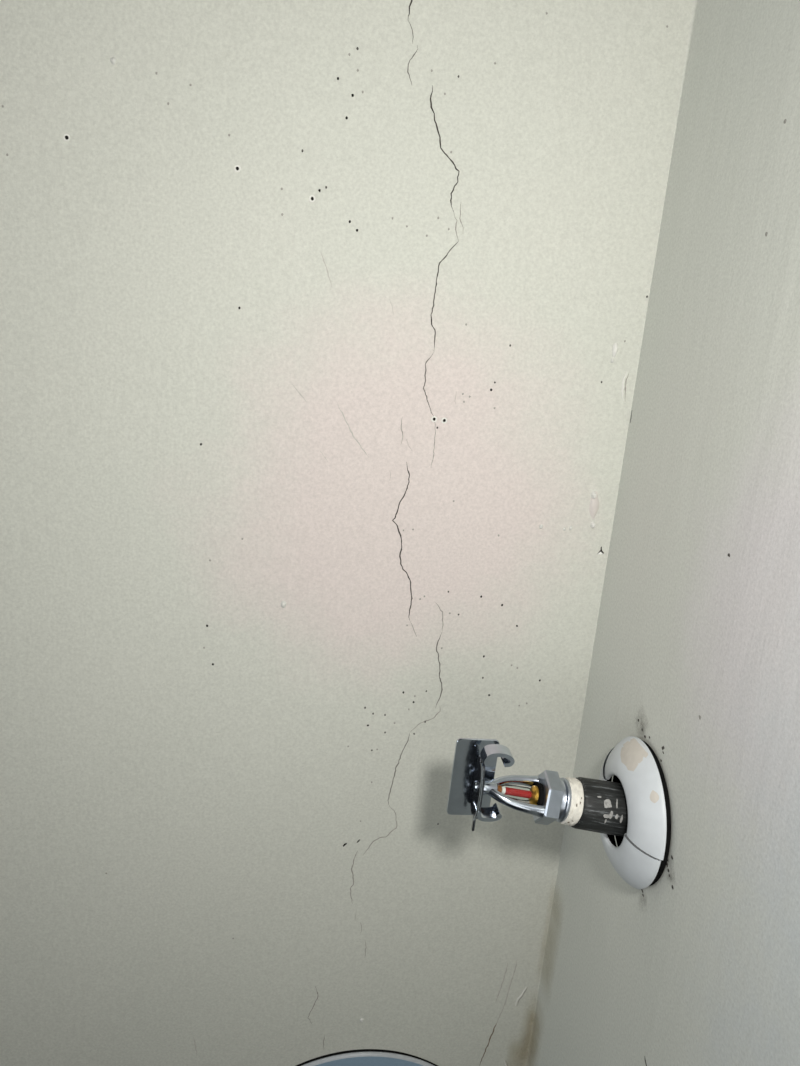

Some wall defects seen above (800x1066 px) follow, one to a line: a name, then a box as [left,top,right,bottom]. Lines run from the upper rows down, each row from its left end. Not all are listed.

crack [350,0,463,956]